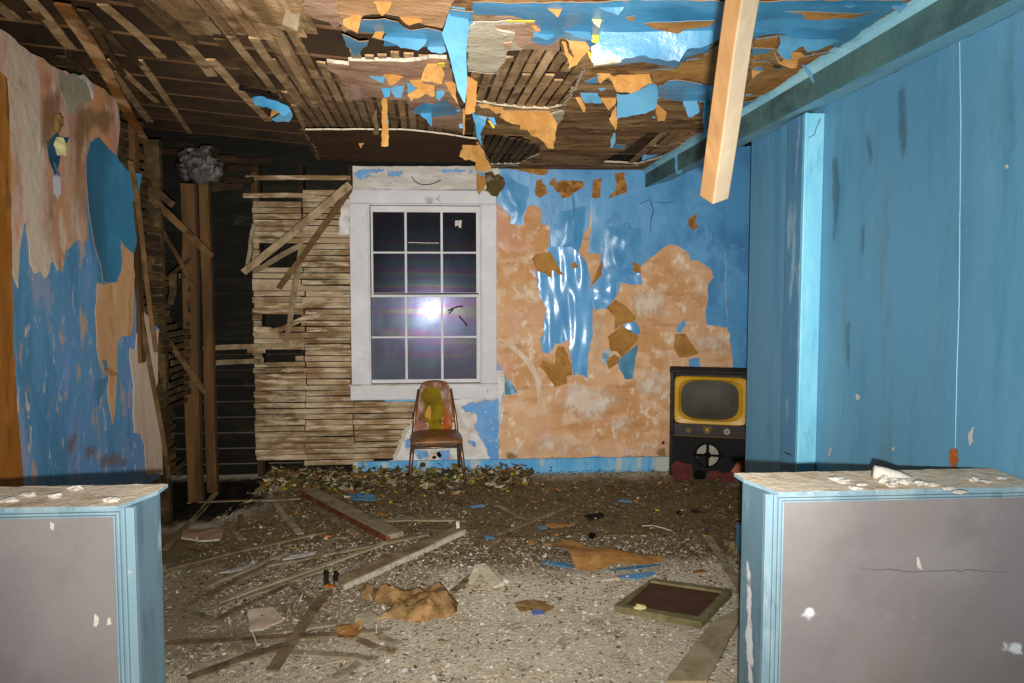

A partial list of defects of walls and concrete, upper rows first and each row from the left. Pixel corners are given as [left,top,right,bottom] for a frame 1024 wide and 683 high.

peeling [0,0,192,484]
spalling [128,0,451,160]
peeling [203,133,733,465]
spalling [466,23,585,125]